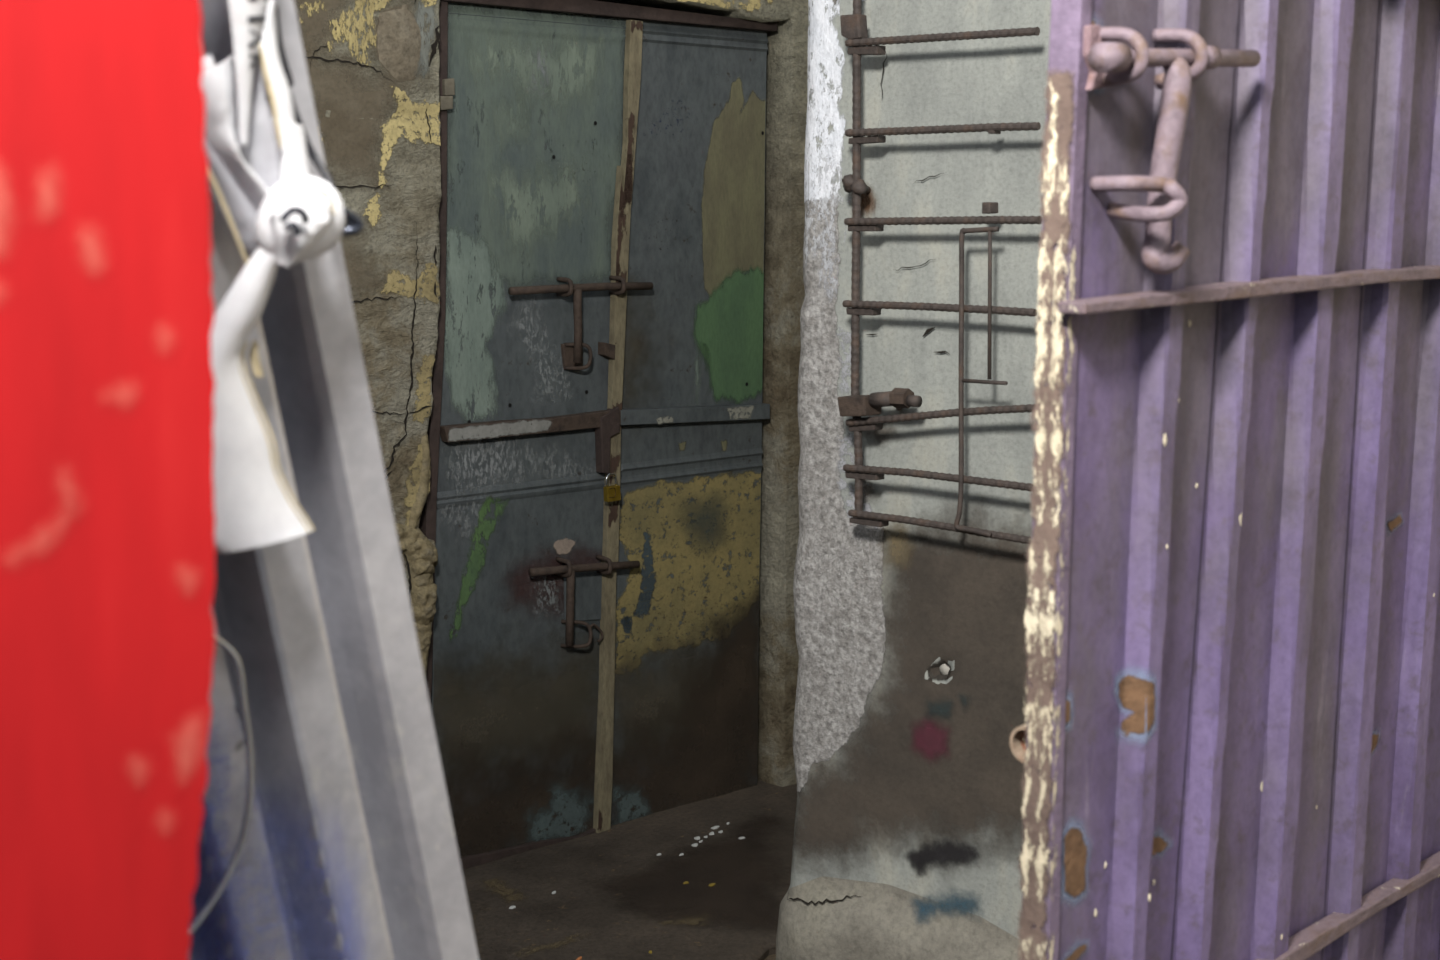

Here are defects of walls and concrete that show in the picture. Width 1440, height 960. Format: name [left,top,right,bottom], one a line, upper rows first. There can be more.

peeling [299,0,391,66]
crack [305,45,393,82]
crack [415,0,440,65]
peeling [677,0,773,12]
crack [335,182,394,190]
peeling [363,86,441,227]
crack [352,222,437,478]
spalling [793,0,886,792]
crack [404,528,422,605]
spalling [395,354,438,679]
leakage [793,520,1030,858]
leakage [607,819,780,927]